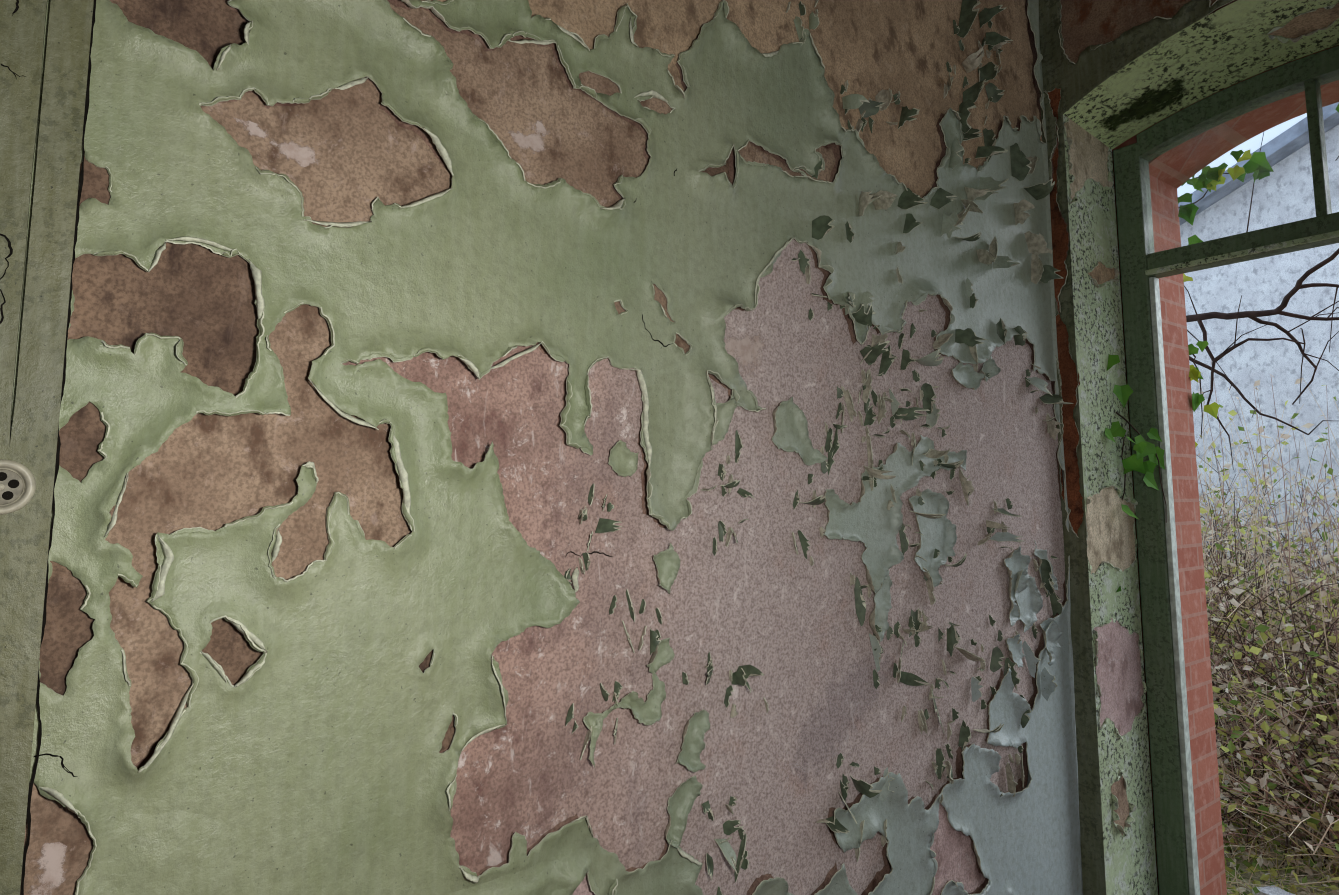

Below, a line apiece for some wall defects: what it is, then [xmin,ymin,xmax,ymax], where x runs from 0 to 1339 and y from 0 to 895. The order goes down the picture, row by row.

peeling [110,0,253,70]
peeling [1058,0,1191,64]
peeling [78,153,112,205]
peeling [199,77,454,229]
crack [0,233,13,324]
peeling [341,0,1113,895]
peeling [39,236,415,773]
peeling [1086,485,1138,574]
peeling [1094,618,1147,740]
peeling [1111,770,1137,837]